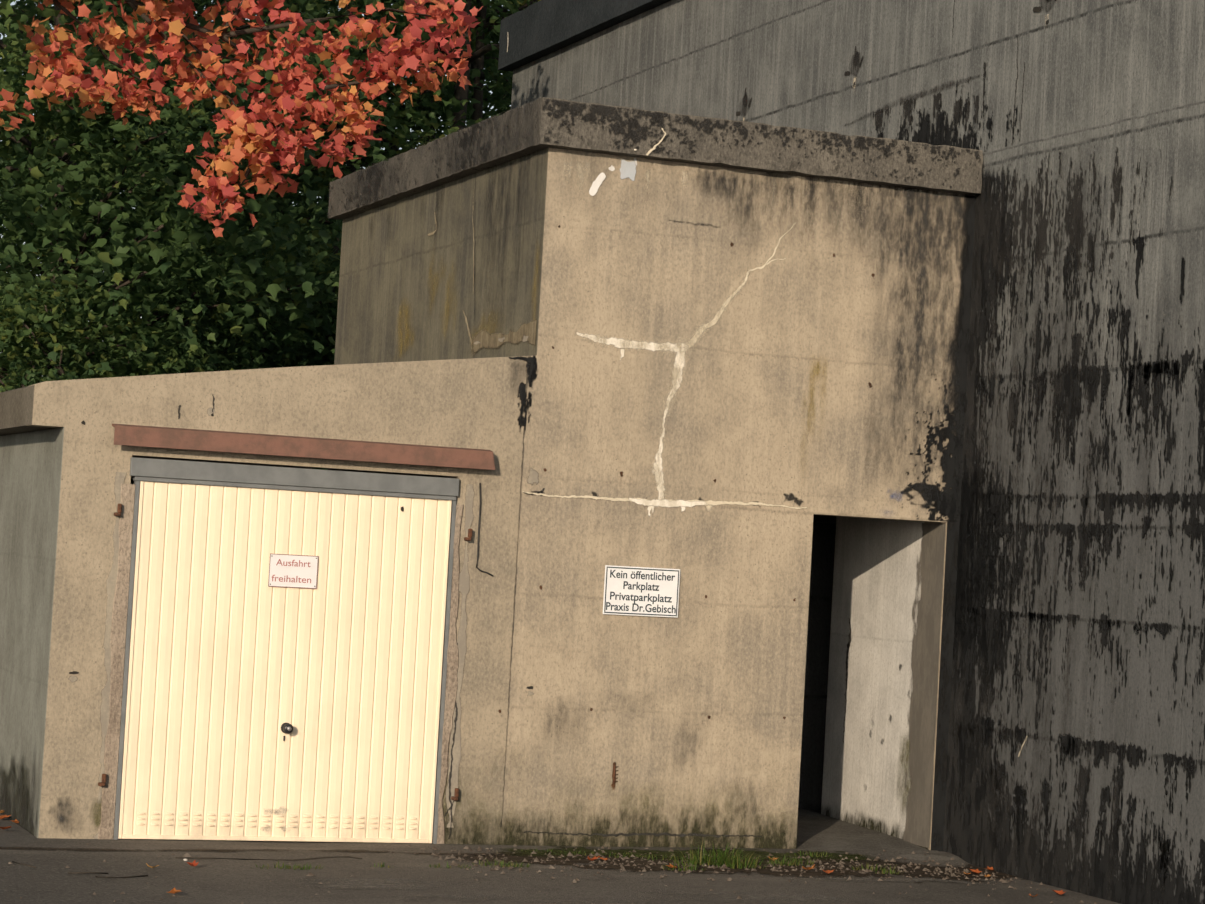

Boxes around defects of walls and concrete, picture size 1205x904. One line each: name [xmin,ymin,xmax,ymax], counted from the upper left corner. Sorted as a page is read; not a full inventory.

spalling [472,320,537,353]
water stain [509,356,537,430]
crack [576,223,796,500]
water stain [882,146,1205,904]
water stain [445,815,797,849]
water stain [823,808,899,838]